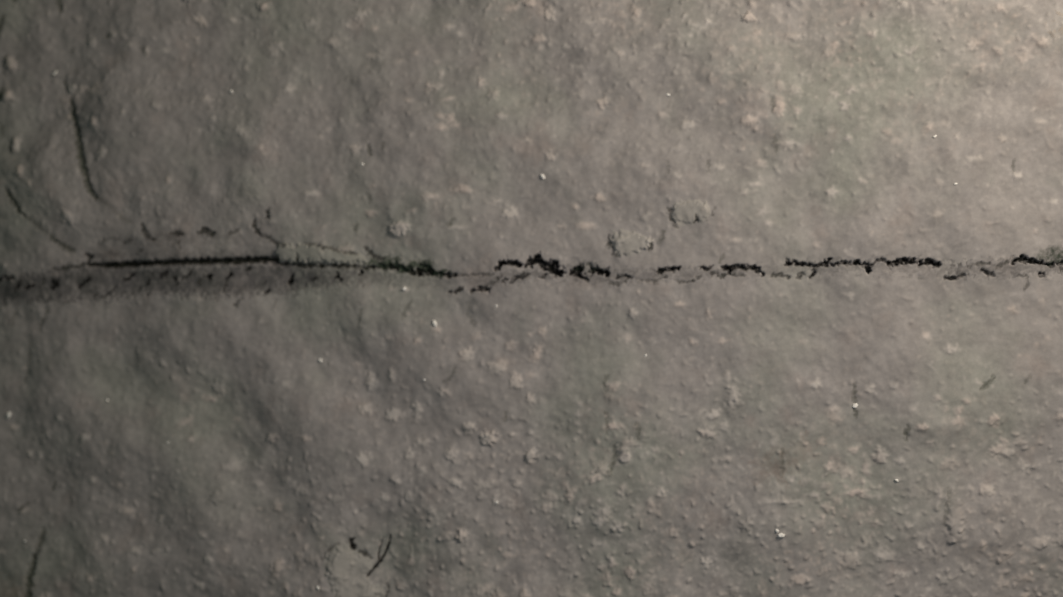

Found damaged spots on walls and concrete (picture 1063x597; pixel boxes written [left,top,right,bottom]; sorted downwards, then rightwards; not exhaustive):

crack [64,81,97,199]
crack [6,190,23,214]
crack [51,237,630,294]
crack [657,248,1063,282]